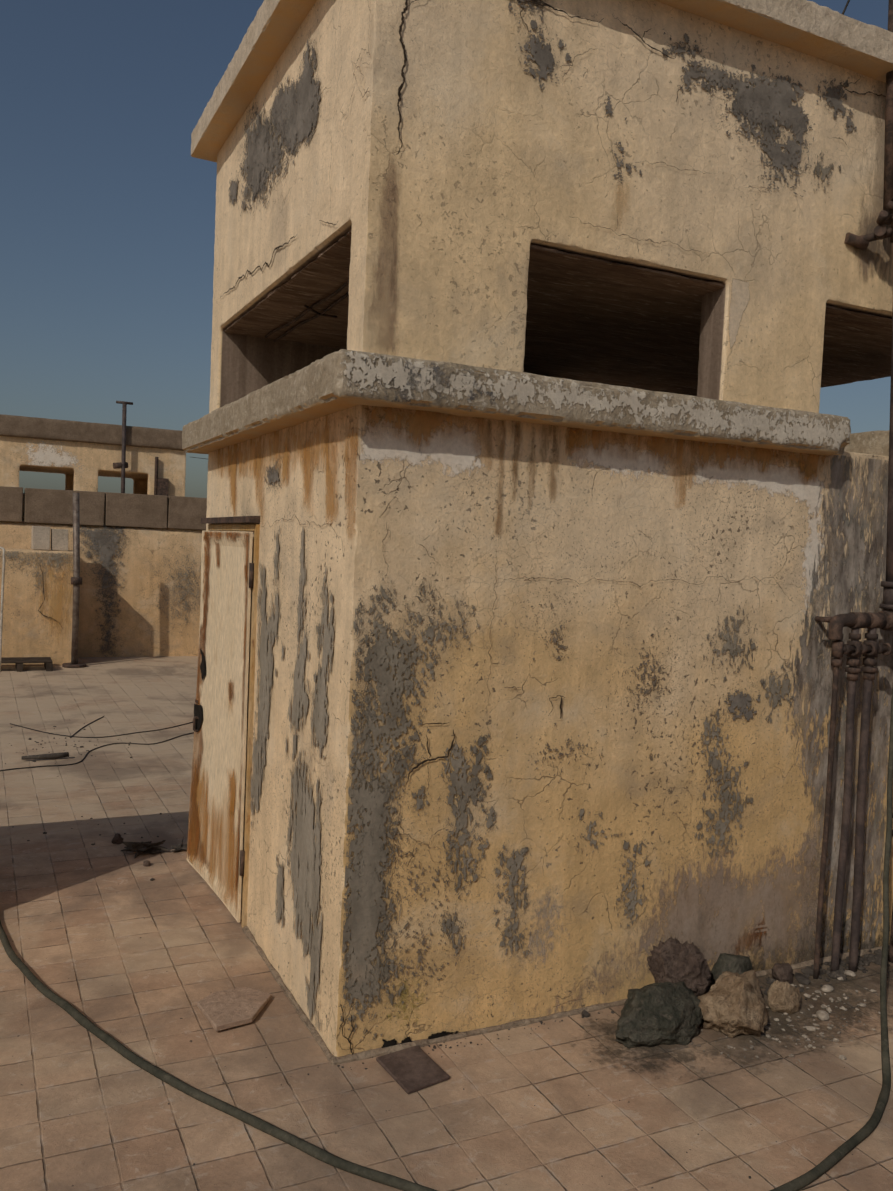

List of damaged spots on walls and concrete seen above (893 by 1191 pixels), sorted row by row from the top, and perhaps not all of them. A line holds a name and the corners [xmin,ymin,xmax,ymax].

peeling [227,37,322,220]
crack [319,5,370,226]
crack [397,0,417,154]
crack [517,0,684,102]
peeling [662,29,857,197]
crack [221,236,296,297]
peeling [340,351,851,451]
rust [196,531,249,714]
peeling [249,527,335,1030]
peeling [340,571,531,1048]
water stain [553,428,893,1049]
water stain [591,1021,728,1070]